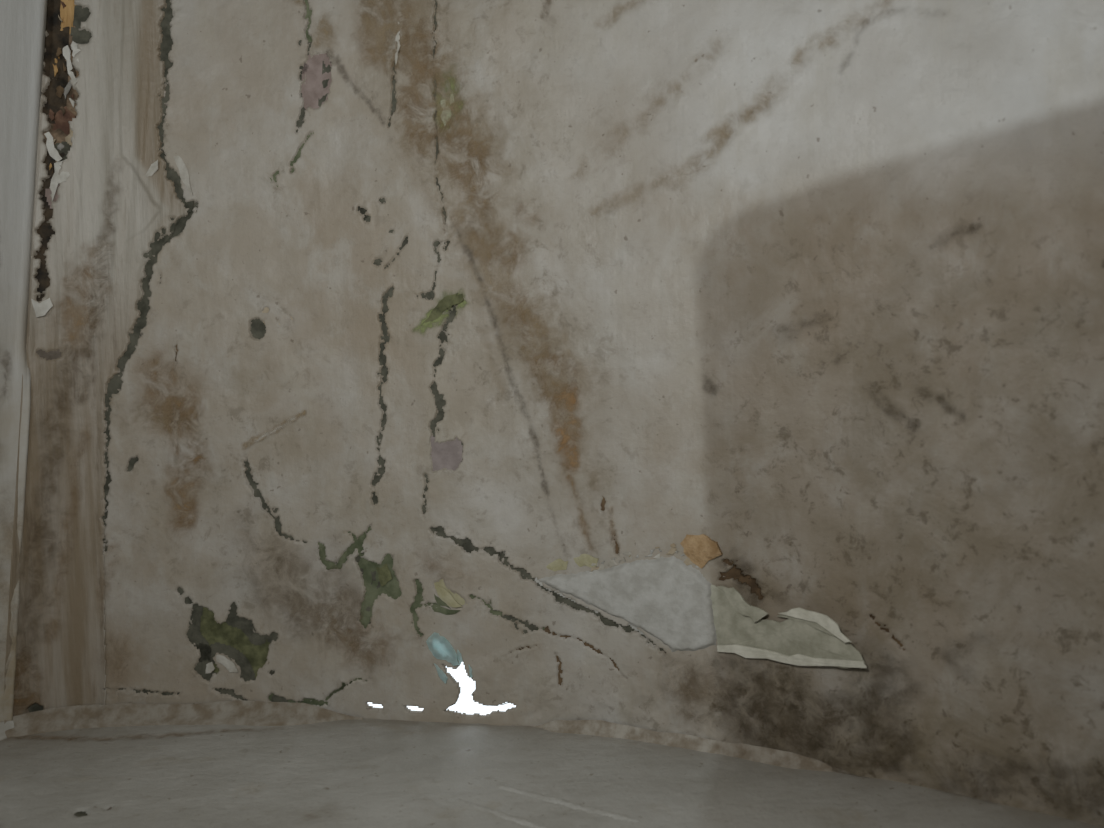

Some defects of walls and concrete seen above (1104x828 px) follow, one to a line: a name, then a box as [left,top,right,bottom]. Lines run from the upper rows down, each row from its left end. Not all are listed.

crack [270,0,332,187]
spalling [31,0,92,317]
crack [101,0,198,552]
crack [358,0,666,686]
crack [244,459,307,543]
peeling [177,587,278,690]
peeling [318,531,402,629]
peeling [710,573,867,668]
peeling [869,614,905,651]